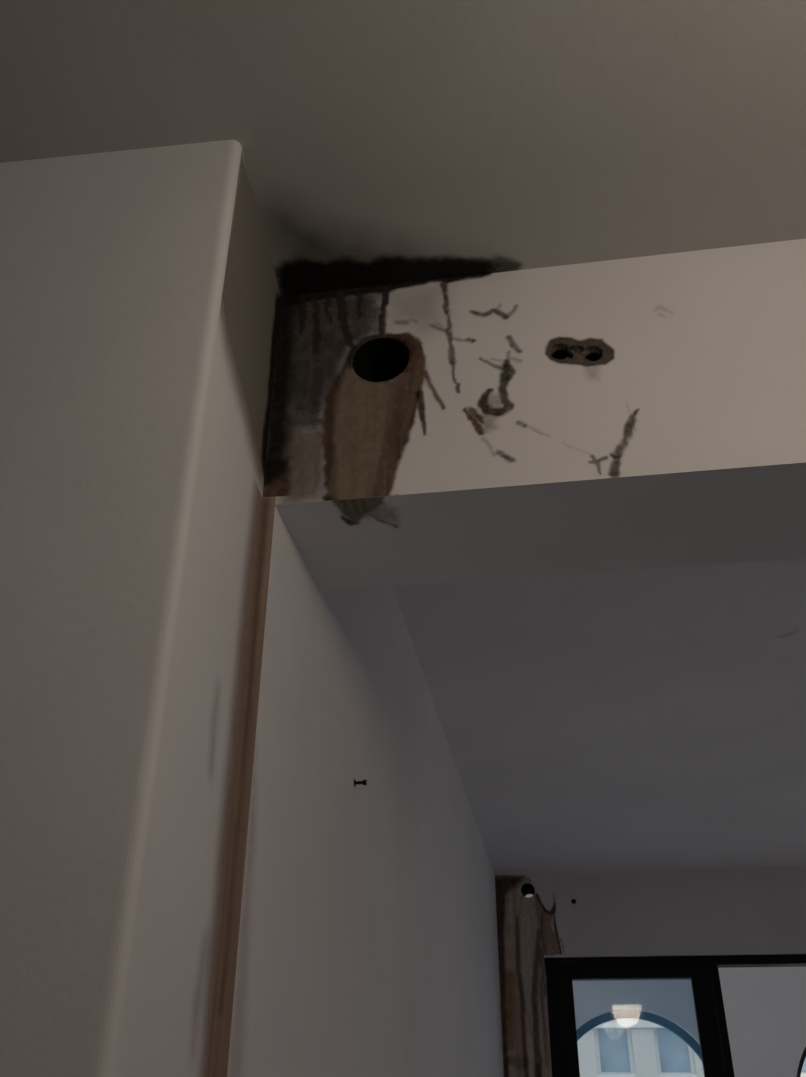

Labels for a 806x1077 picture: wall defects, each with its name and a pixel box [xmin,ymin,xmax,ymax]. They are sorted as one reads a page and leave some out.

hole [546,337,614,366]
crack [590,410,638,477]
water stain [203,155,520,1077]
peeling [535,894,562,955]
water stain [495,875,551,1077]